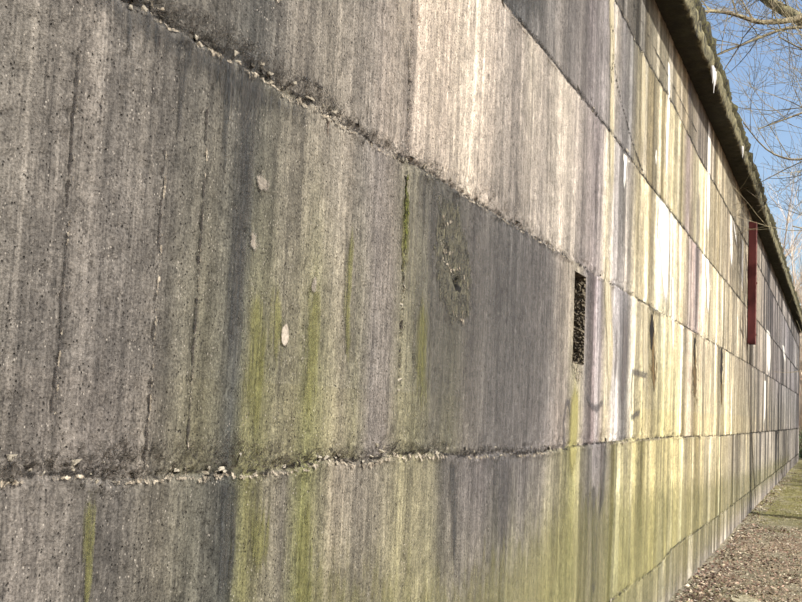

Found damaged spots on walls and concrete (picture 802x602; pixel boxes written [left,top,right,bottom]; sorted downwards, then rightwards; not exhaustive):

water stain [109,1,273,347]
water stain [655,62,671,179]
water stain [271,292,282,358]
water stain [657,199,674,348]
water stain [730,215,744,288]